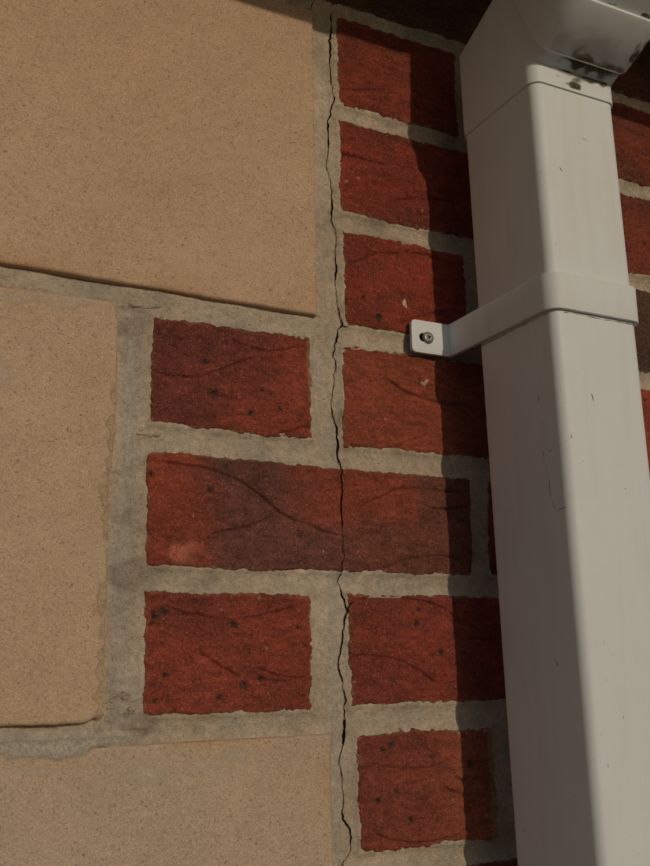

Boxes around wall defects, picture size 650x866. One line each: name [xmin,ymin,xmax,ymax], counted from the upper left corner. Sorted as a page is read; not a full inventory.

crack [311,1,355,866]